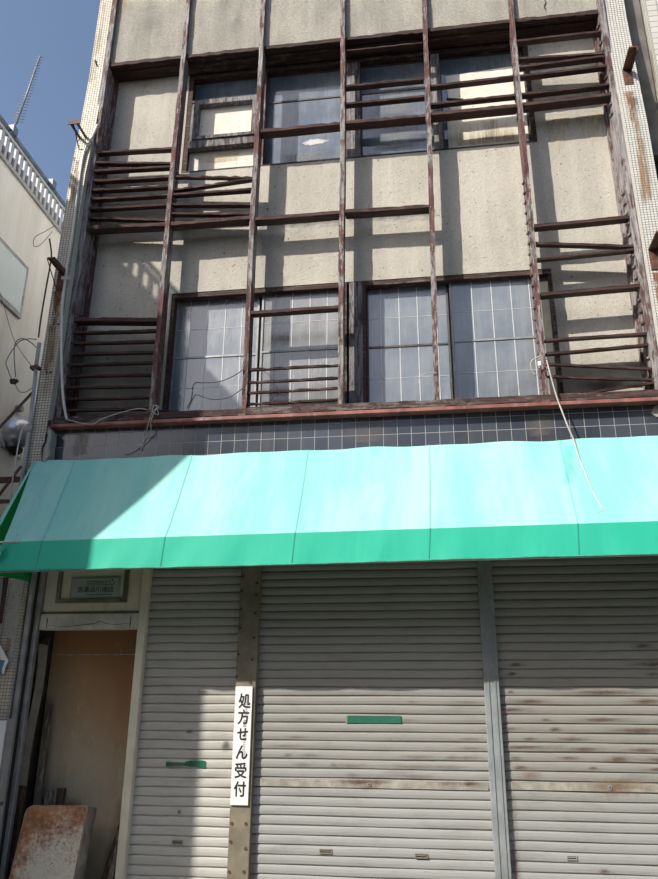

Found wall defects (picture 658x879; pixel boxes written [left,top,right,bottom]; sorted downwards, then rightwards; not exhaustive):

rust [624,91,650,199]